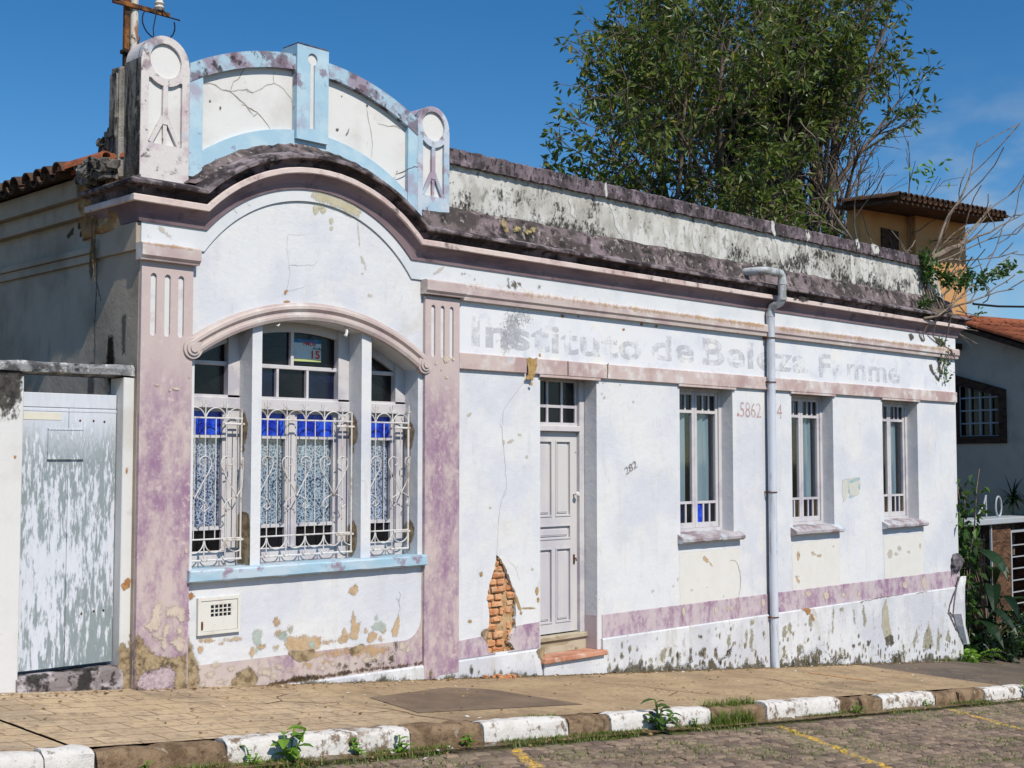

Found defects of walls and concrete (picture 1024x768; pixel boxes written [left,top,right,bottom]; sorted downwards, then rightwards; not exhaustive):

crack [203,69,292,128]
damp [452,189,528,218]
damp [534,182,624,239]
damp [727,221,910,292]
damp [91,315,126,364]
flaking render [526,357,538,386]
peeling [144,601,185,652]
peeling [198,611,411,680]
flaking render [479,555,540,653]
damp [608,599,961,673]
peeling [136,667,176,690]